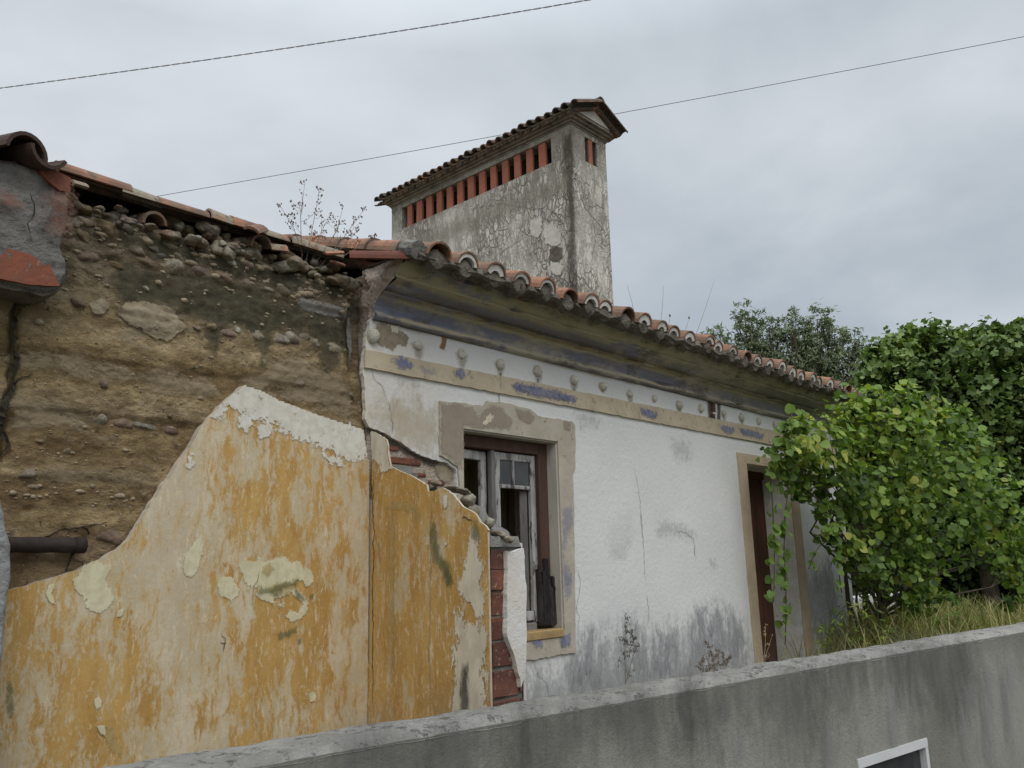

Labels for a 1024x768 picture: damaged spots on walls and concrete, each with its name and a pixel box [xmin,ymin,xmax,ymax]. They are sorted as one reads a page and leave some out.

crack [473,185,605,287]
flaking render [88,298,187,342]
peeling [2,351,534,508]
peeling [72,559,125,617]
peeling [217,556,314,622]
peeling [449,526,489,712]